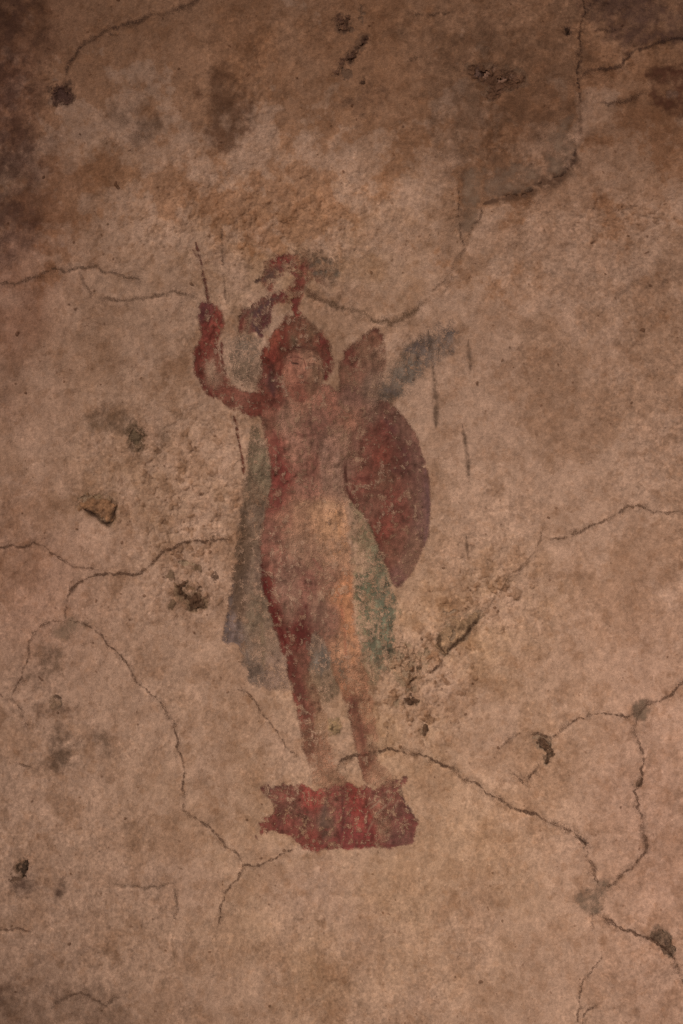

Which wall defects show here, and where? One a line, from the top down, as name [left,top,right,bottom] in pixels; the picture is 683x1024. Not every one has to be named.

crack [576,1,683,94]
spalling [78,493,119,525]
crack [58,538,224,596]
spalling [166,560,218,612]
spalling [533,734,555,766]
crack [340,747,586,845]
crack [532,713,648,882]
crack [195,817,292,921]
crack [605,918,678,967]